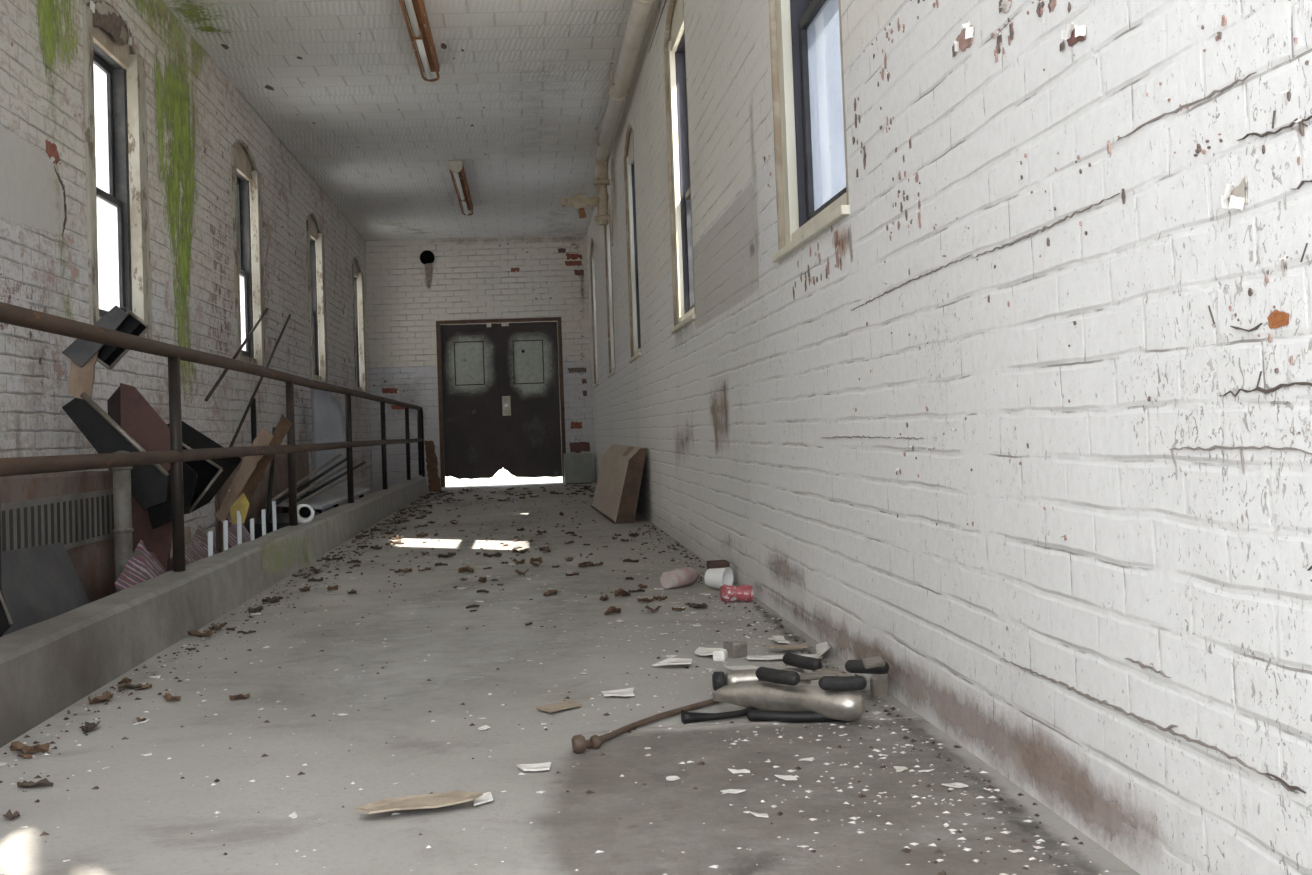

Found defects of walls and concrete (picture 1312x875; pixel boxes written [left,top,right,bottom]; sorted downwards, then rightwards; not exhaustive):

crack [1116,72,1257,141]
crack [1236,111,1312,141]
spalling [793,226,853,299]
crack [851,193,1120,311]
crack [1208,305,1263,332]
crack [1219,371,1312,397]
crack [1169,445,1312,474]